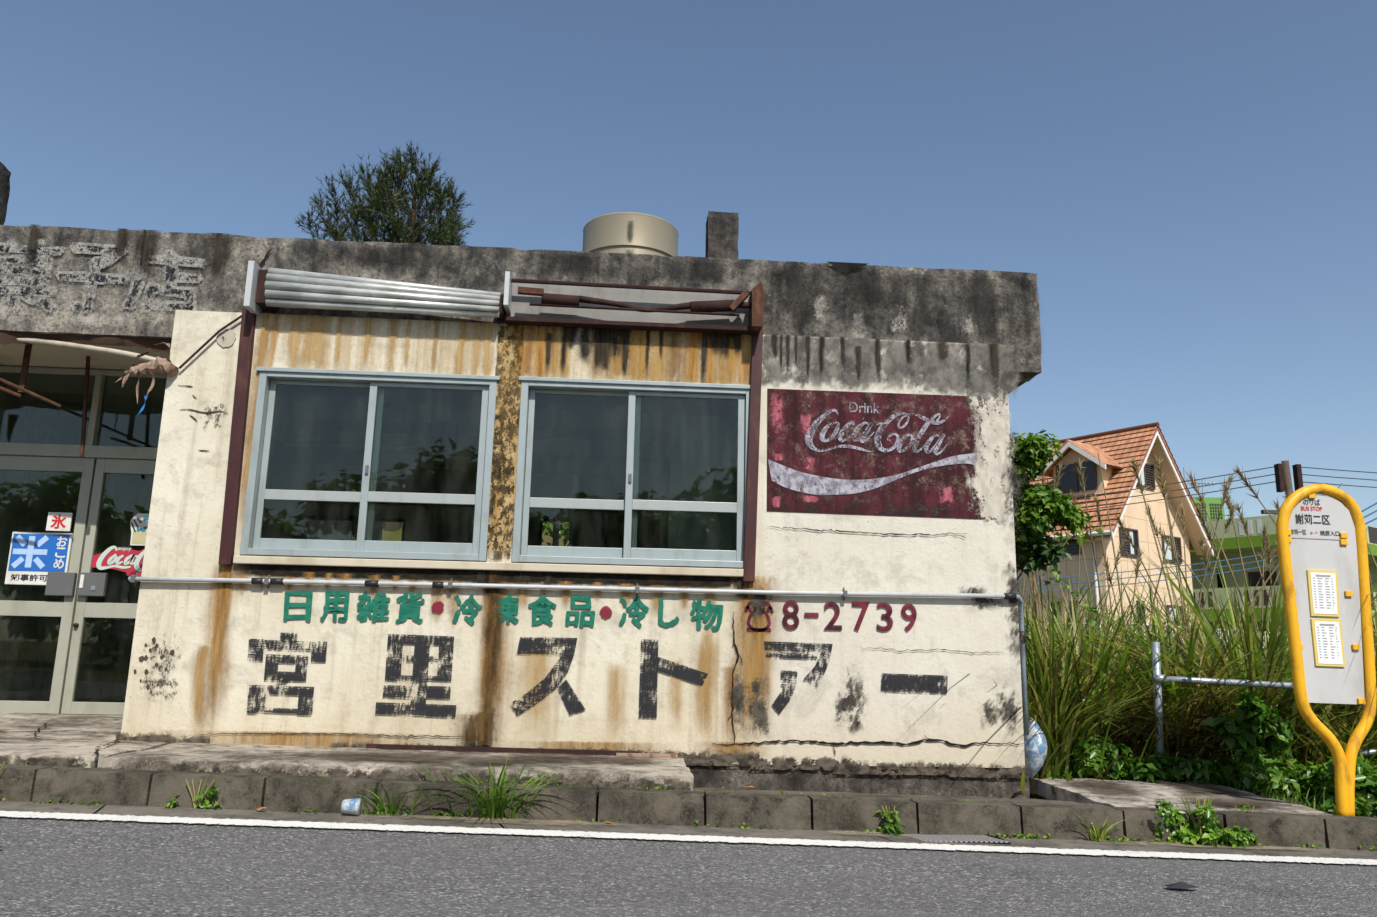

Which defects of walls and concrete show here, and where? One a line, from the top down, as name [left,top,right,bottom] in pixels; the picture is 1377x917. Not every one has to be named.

damp [26,224,39,264]
damp [116,228,157,272]
damp [206,233,230,271]
damp [541,221,633,275]
corrosion [242,313,342,506]
corrosion [456,322,569,553]
corrosion [593,329,751,385]
damp [761,262,1033,402]
corrosion [194,565,265,719]
corrosion [481,581,545,699]
corrosion [698,577,769,725]
crack [713,612,1024,754]